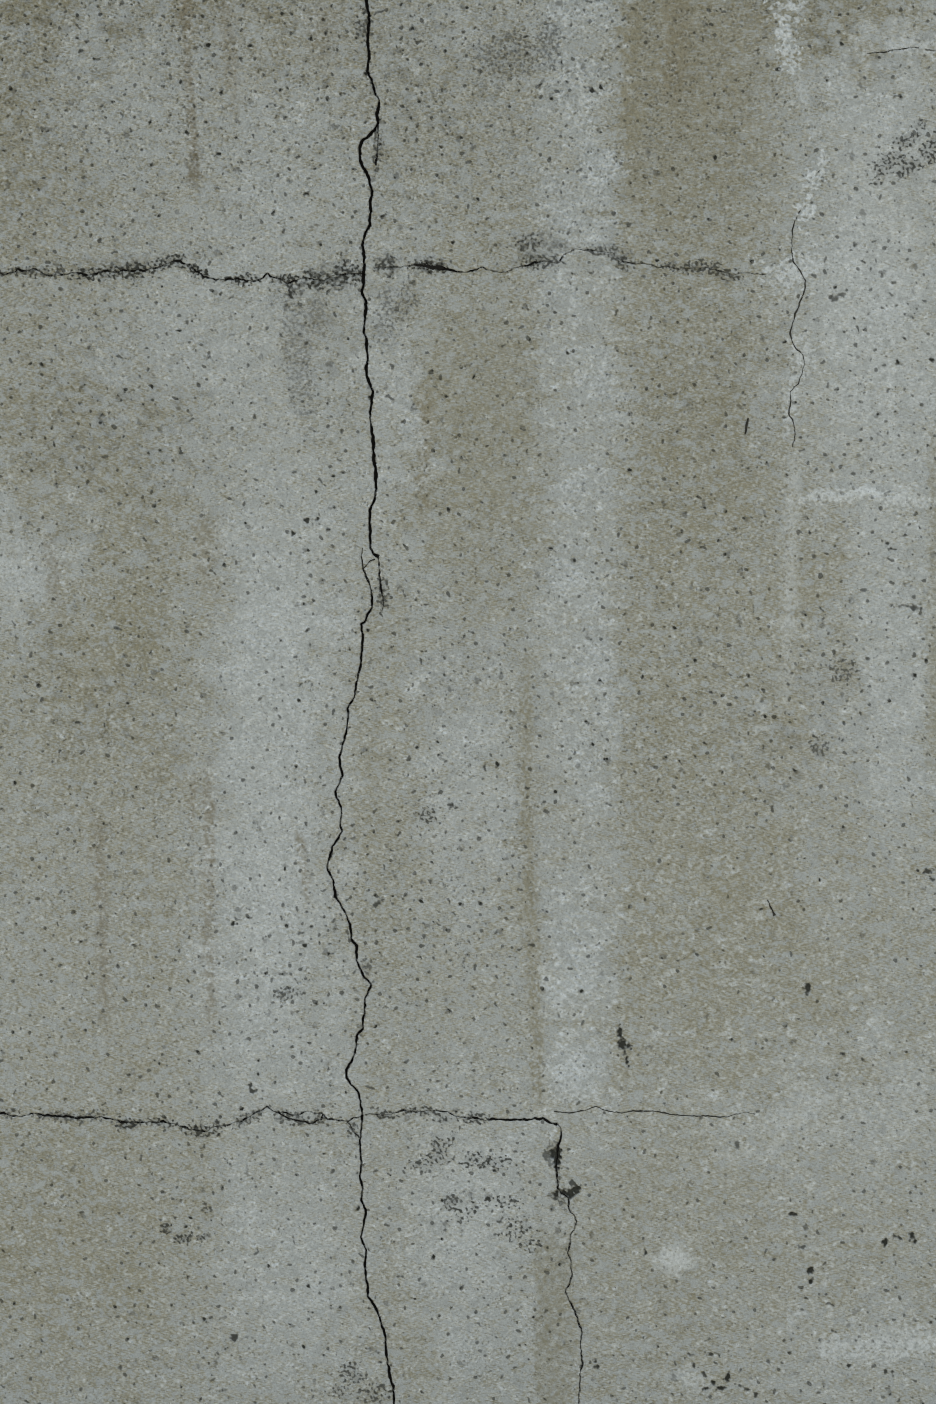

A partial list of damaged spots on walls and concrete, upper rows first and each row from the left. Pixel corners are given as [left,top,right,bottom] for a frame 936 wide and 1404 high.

crack [0,0,748,1404]